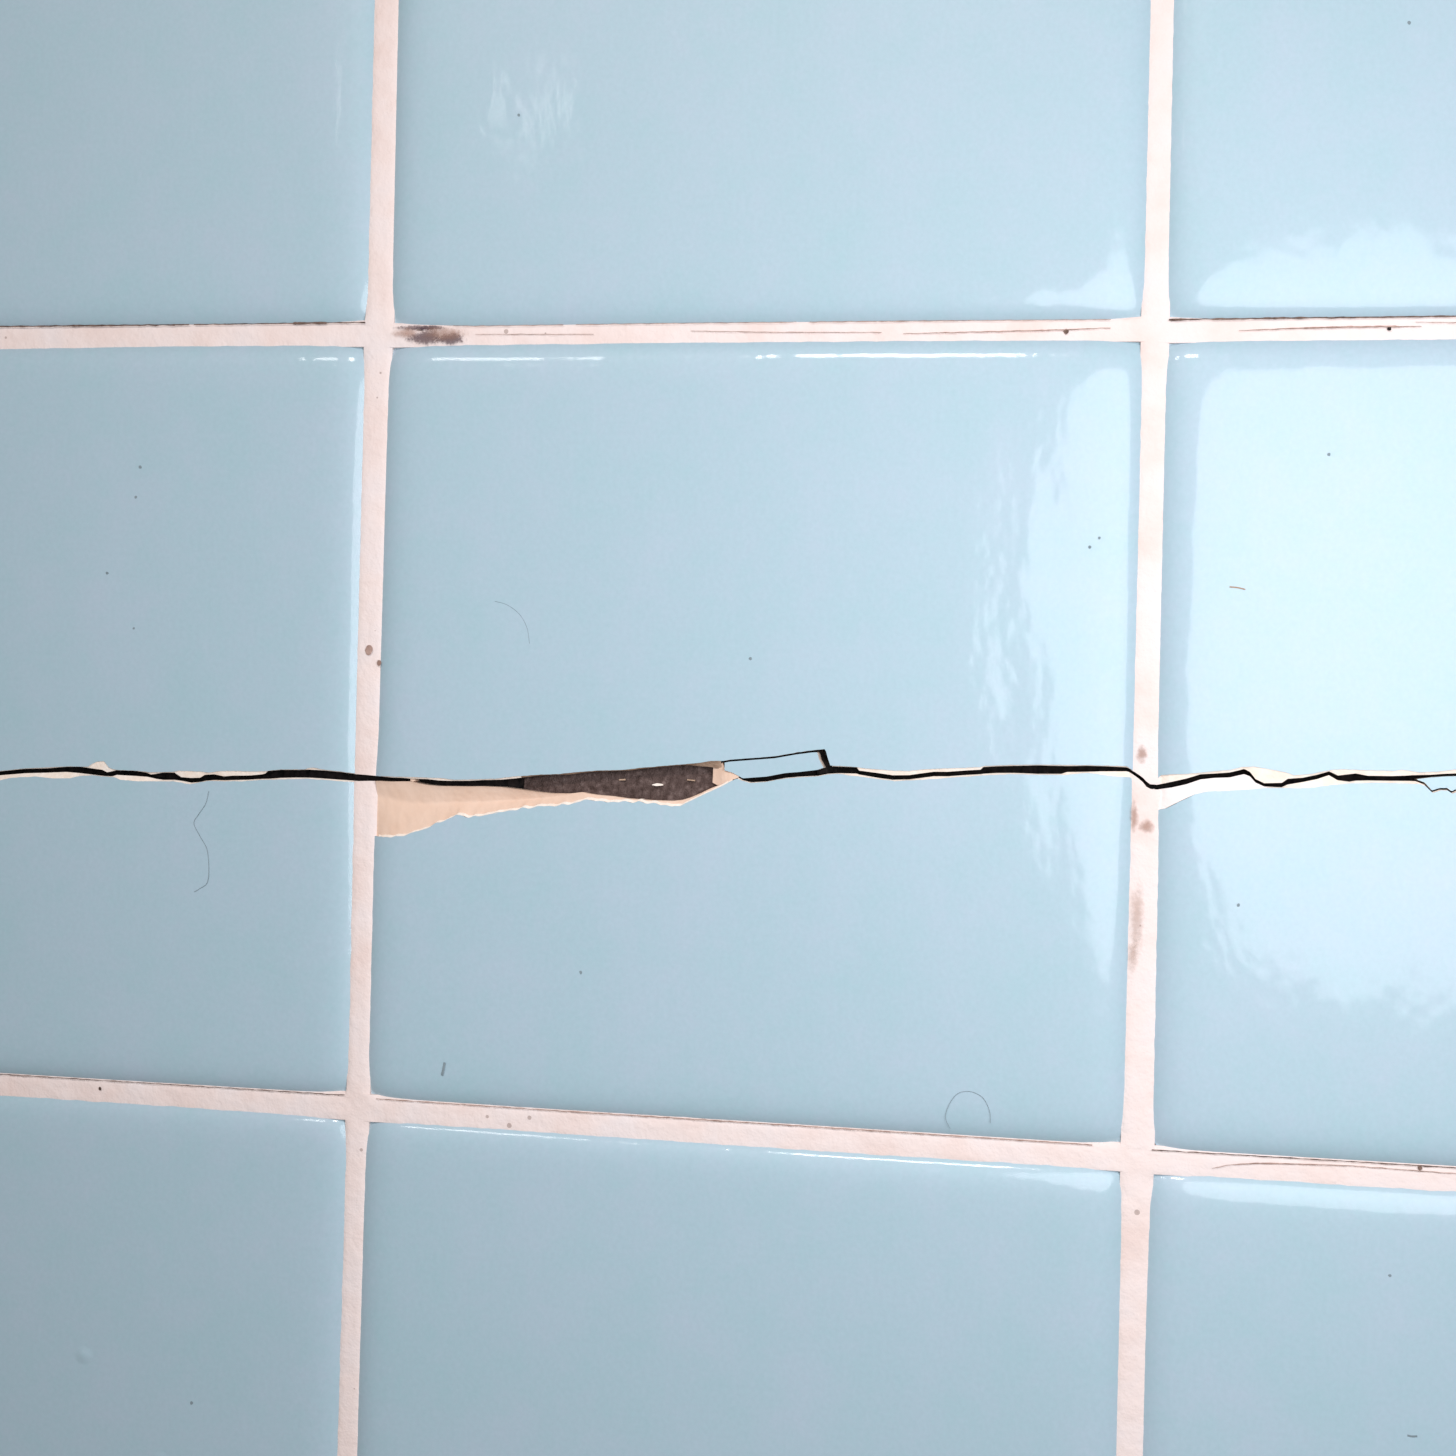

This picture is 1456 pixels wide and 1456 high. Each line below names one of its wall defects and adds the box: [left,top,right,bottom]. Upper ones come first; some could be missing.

spalling [376,780,733,837]
crack [0,749,1456,892]